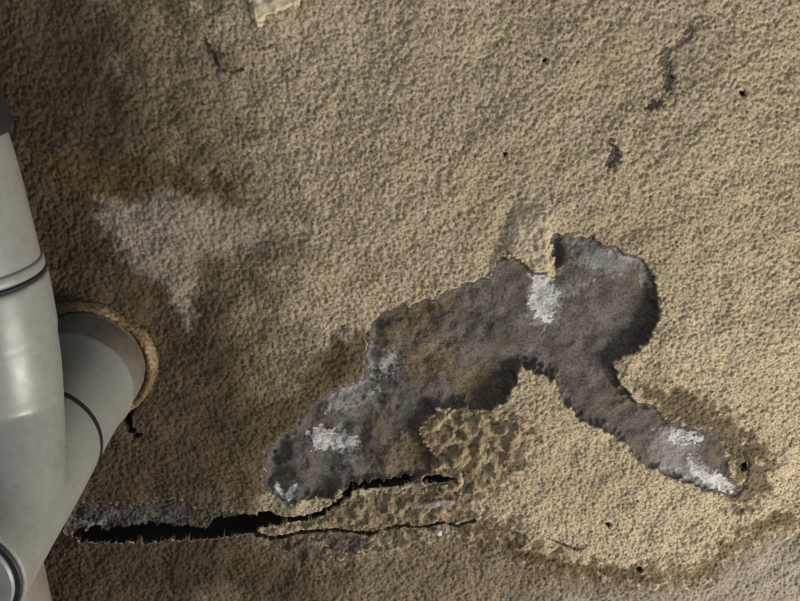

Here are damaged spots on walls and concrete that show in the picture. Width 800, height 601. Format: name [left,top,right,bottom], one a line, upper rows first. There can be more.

peeling [248,0,301,28]
crack [72,473,476,545]
damp [334,409,541,543]
spalling [262,233,750,568]
damp [634,380,777,515]